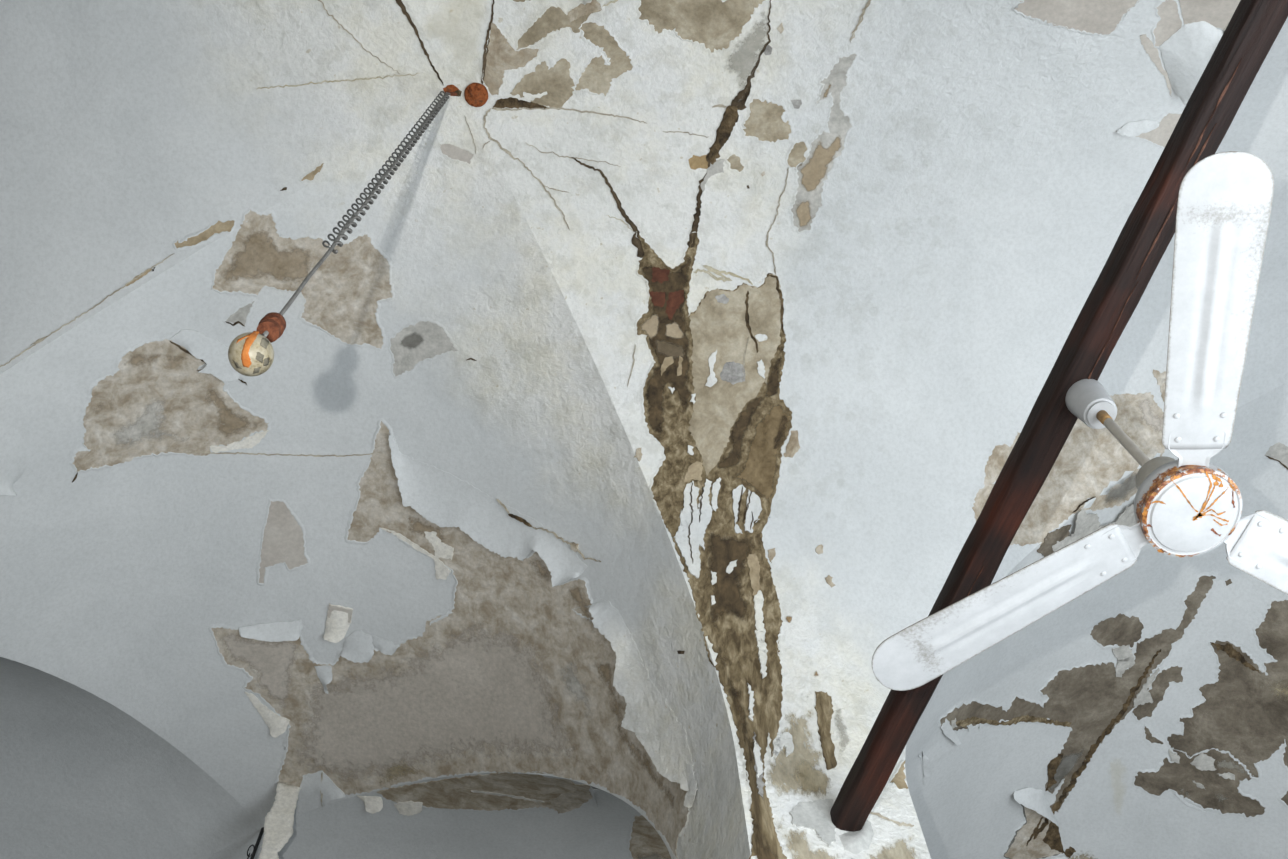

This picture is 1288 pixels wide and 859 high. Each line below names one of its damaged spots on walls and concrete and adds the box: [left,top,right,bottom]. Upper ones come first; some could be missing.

crack [257,0,444,89]
peeling [479,0,636,109]
crack [464,0,789,287]
peeling [636,0,769,55]
peeling [1011,0,1241,150]
peeling [172,207,461,379]
peeling [69,329,272,482]
peeling [969,428,1021,529]
peeling [1010,369,1166,557]
peeling [208,418,692,859]
water stain [769,714,829,795]
peeling [936,571,1288,859]